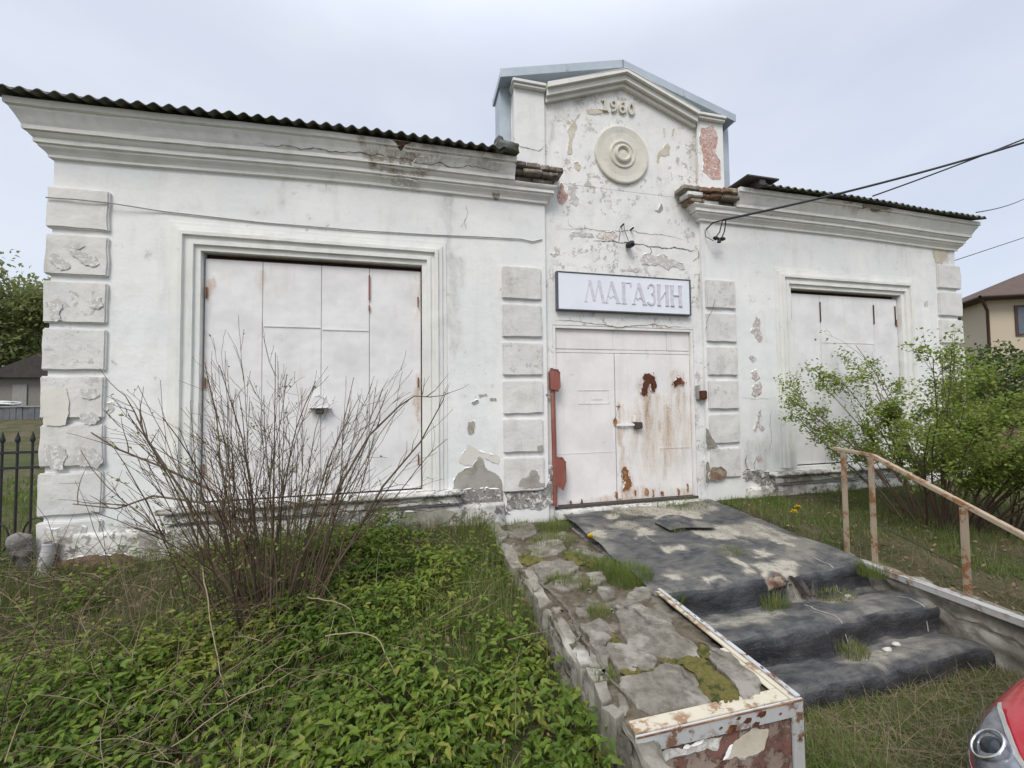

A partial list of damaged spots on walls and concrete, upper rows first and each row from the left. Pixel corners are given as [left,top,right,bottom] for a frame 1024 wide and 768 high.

crack [267,145,506,171]
peeling [557,108,610,206]
peeling [699,125,721,180]
crack [568,222,699,261]
peeling [620,253,685,273]
peeling [750,316,762,342]
rust [639,372,657,396]
peeling [75,445,103,469]
peeling [328,420,553,532]
rust [615,467,664,498]
spalling [706,461,727,483]